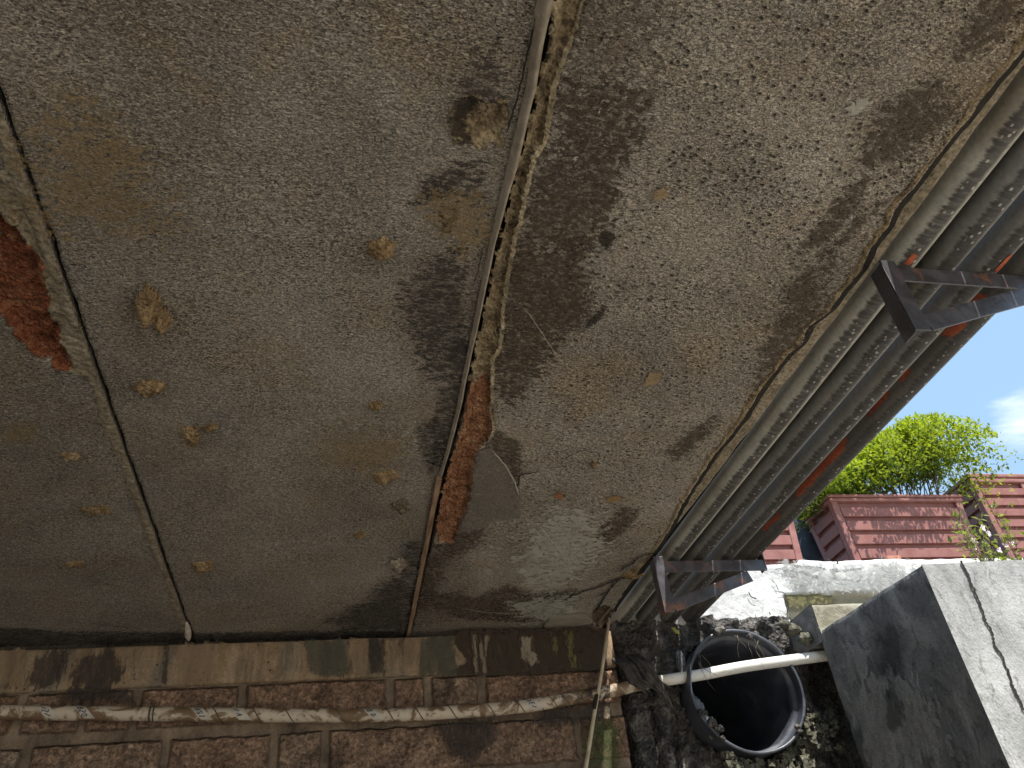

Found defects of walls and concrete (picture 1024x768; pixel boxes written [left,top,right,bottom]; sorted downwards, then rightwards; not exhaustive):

crack [0,86,192,632]
damp [391,244,477,475]
damp [408,152,494,211]
damp [452,37,516,115]
crack [416,0,556,606]
damp [483,431,525,479]
spalling [434,0,585,543]
damp [488,0,689,408]
damp [741,68,974,401]
damp [0,504,640,706]
crack [960,560,1024,710]